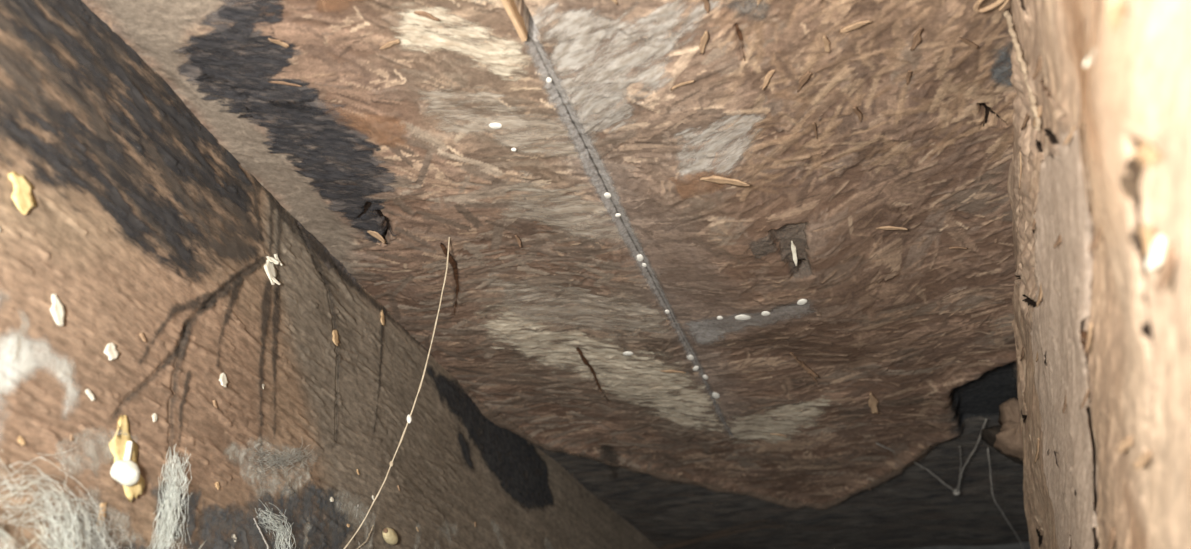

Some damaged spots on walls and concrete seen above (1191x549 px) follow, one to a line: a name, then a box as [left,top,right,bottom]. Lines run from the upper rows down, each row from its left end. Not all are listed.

leakage [0,0,429,549]
leakage [395,4,532,81]
leakage [502,183,623,239]
leakage [421,0,769,157]
leakage [676,114,764,182]
crack [1119,137,1155,342]
leakage [476,279,840,445]
leakage [427,367,1029,549]